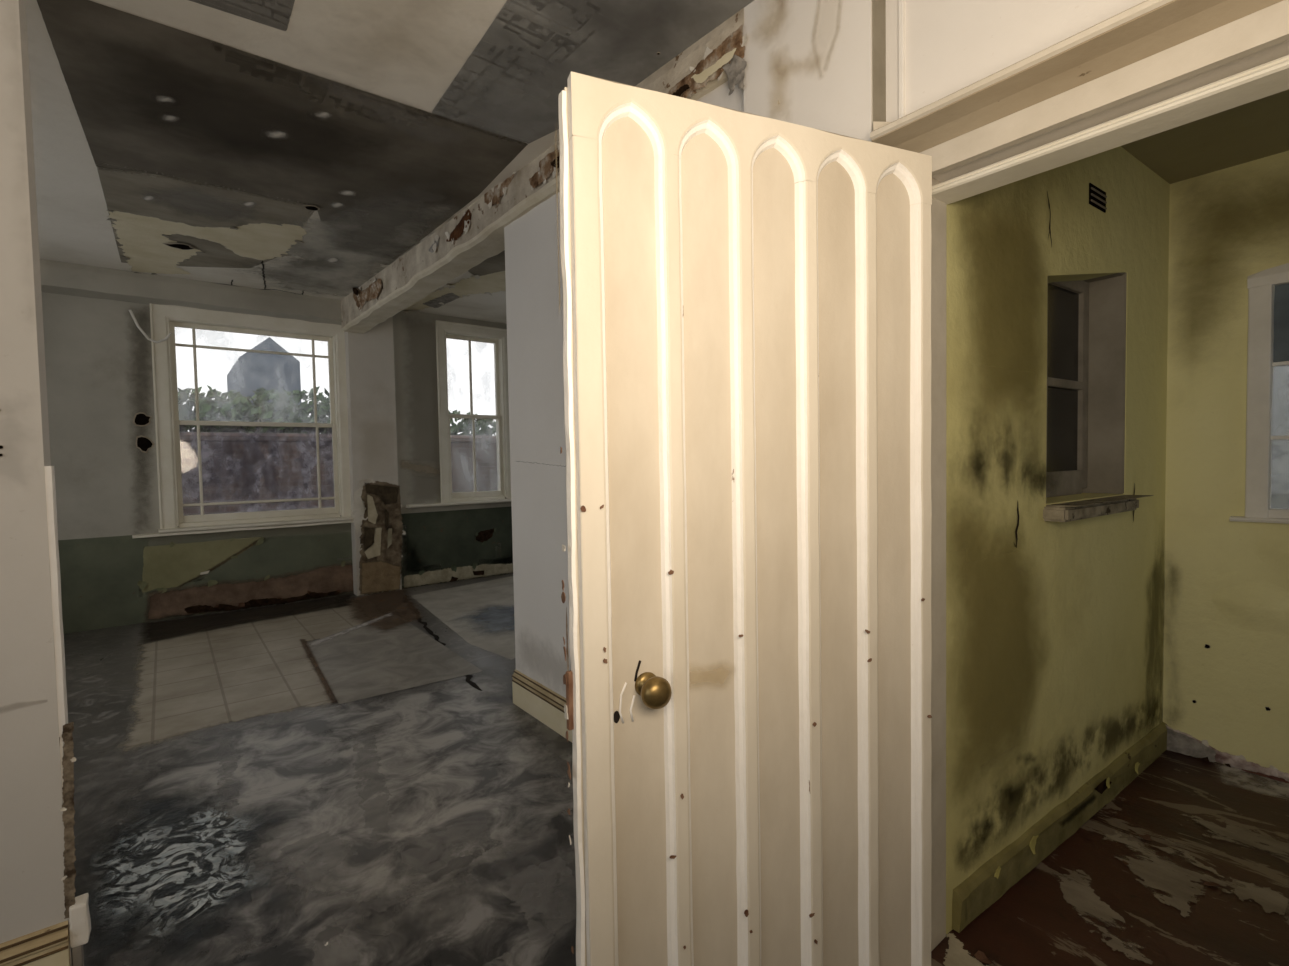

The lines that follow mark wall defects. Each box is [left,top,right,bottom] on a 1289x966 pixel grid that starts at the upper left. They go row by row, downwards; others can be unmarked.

flaking render [667,24,747,98]
flaking render [484,145,560,209]
peeling [107,210,306,275]
flaking render [429,209,472,253]
flaking render [352,277,382,311]
peeling [403,250,506,313]
flaking render [137,478,513,620]
damp [958,524,1034,764]
damp [1087,702,1158,751]
damp [960,749,1077,857]
peeling [966,724,1289,964]
peeling [943,933,992,966]